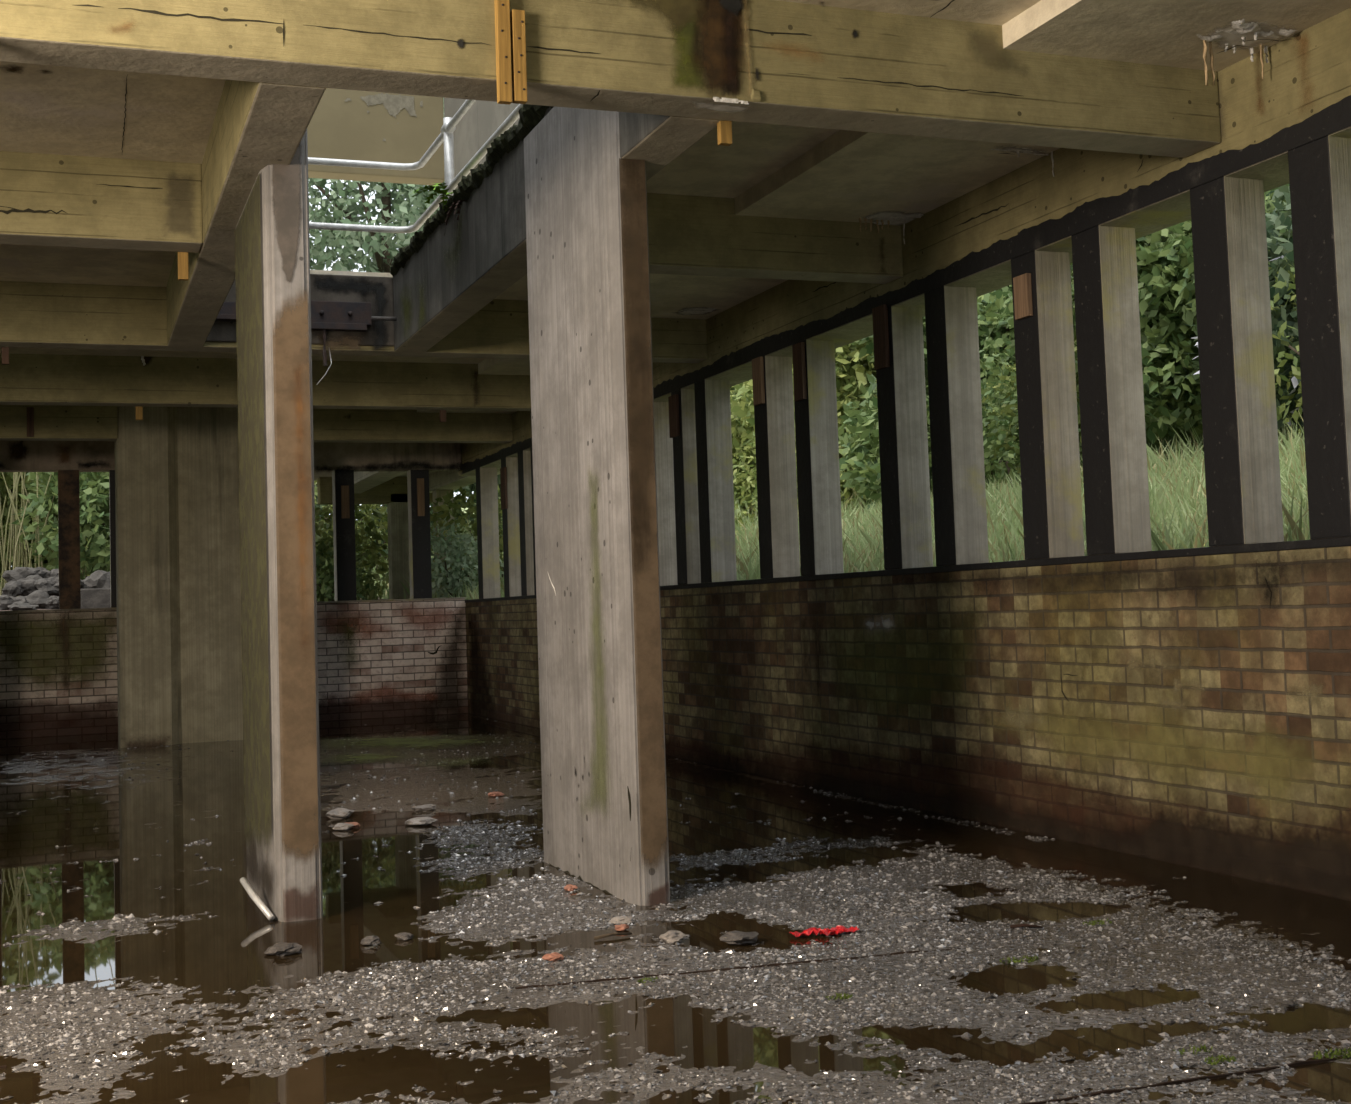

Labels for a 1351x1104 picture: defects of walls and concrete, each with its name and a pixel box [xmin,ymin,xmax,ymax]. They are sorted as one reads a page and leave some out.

water stain [632,0,749,112]
rust [693,0,752,95]
efflorescence [1197,19,1298,85]
crack [0,206,66,214]
water stain [319,619,493,722]
water stain [665,737,1351,901]